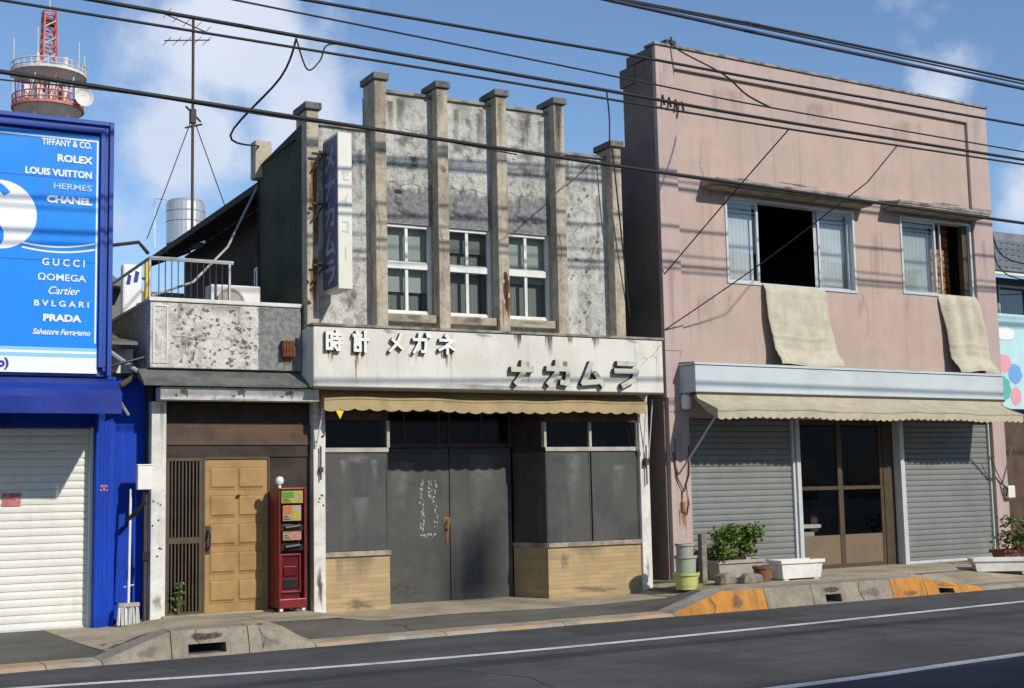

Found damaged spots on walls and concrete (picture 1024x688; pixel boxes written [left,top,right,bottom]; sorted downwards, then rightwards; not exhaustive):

corrosion [309,162,318,245]
peeling [171,280,315,371]